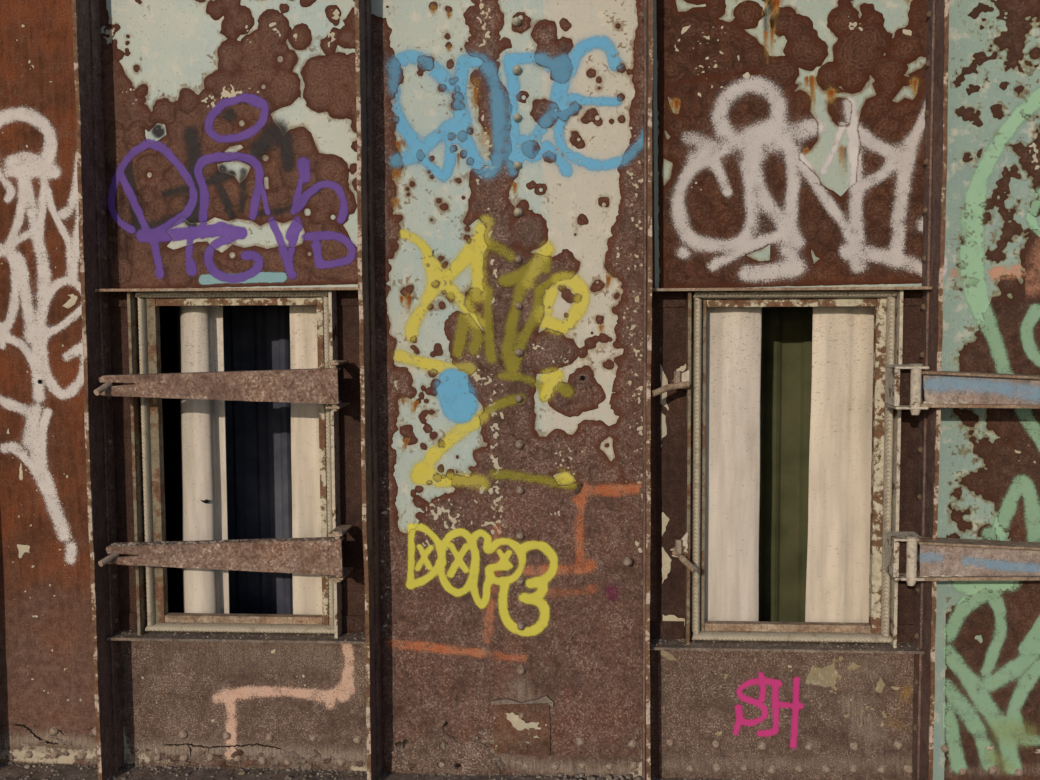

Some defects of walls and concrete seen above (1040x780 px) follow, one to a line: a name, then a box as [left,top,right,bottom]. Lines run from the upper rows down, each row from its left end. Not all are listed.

peeling [100,0,358,289]
corrosion [805,76,815,99]
peeling [953,0,1040,127]
peeling [959,113,1040,375]
peeling [371,0,927,778]
peeling [923,401,1040,542]
crack [14,724,65,745]
crack [164,743,286,757]
peeling [944,581,1040,780]